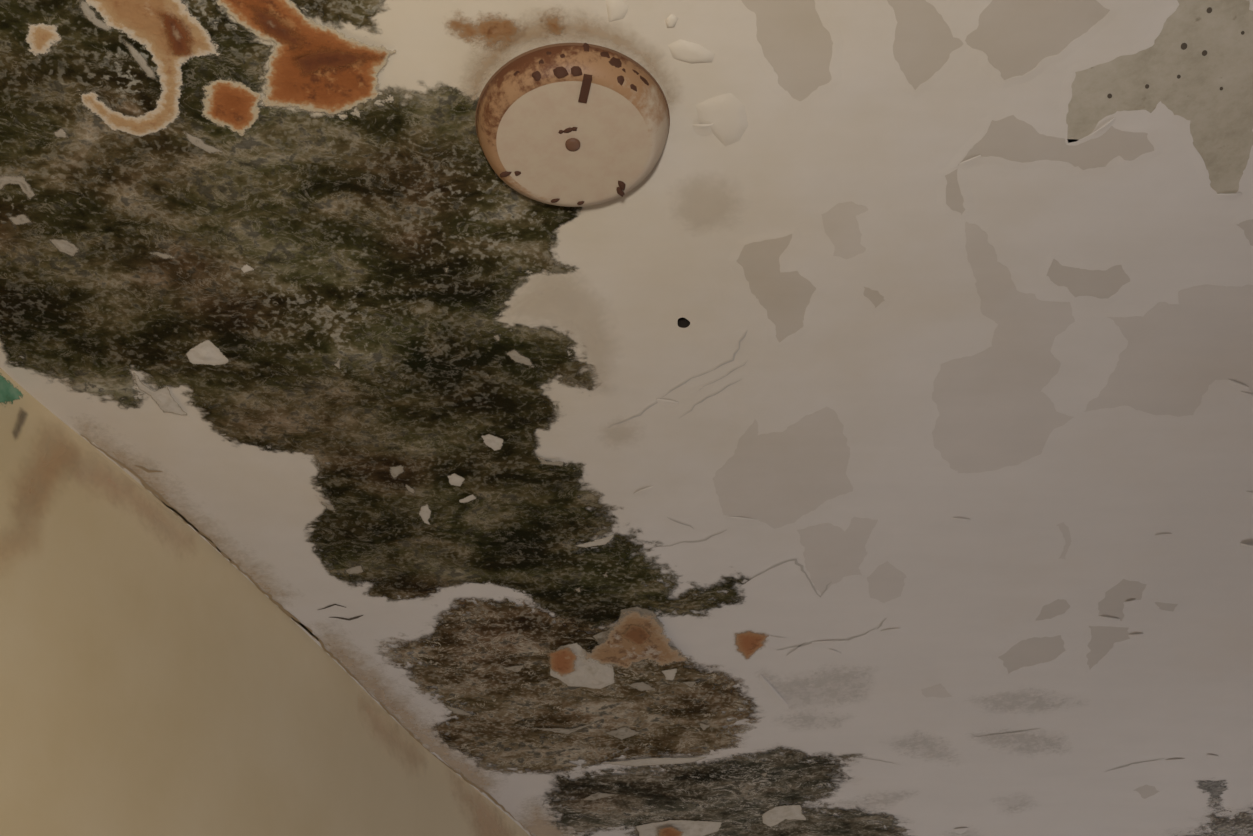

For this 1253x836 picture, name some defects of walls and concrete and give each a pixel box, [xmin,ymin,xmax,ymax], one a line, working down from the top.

rust [79,0,220,137]
rust [202,0,396,136]
peeling [873,0,1253,201]
water stain [0,0,909,836]
crack [608,332,748,428]
rust [548,610,687,676]
rust [735,631,769,659]
crack [773,636,812,656]
water stain [1174,780,1253,836]